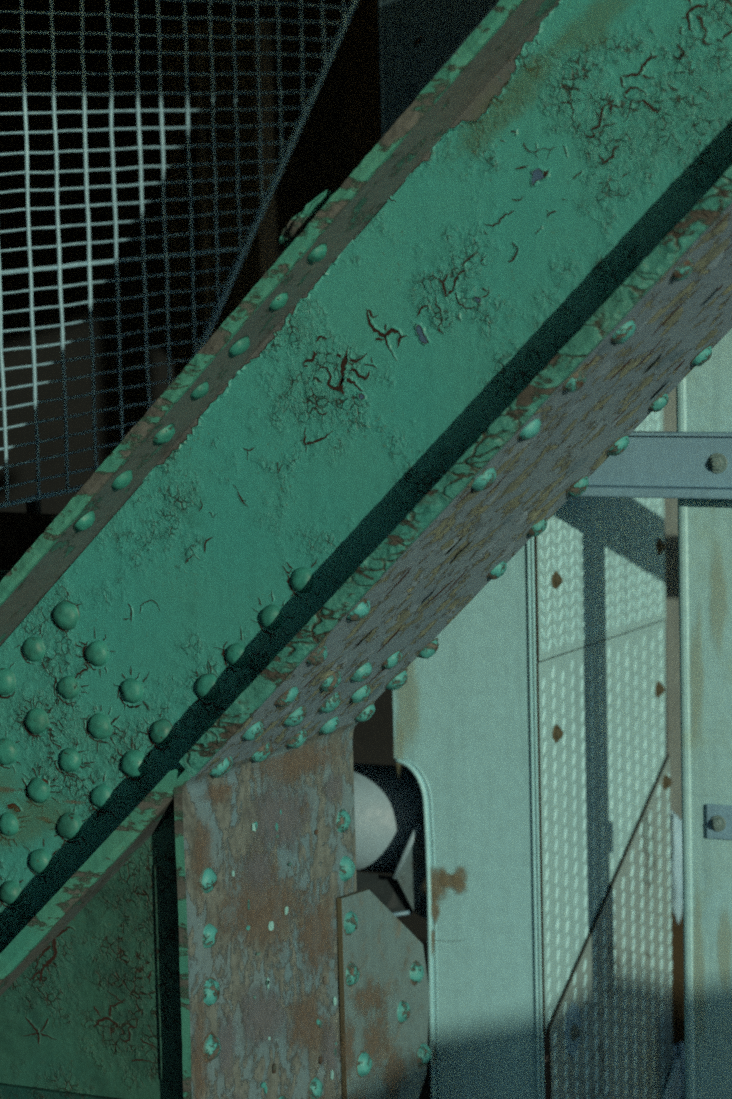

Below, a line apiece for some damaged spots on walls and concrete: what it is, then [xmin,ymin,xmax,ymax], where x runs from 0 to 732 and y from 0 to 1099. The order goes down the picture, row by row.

peeling [408,0,563,176]
peeling [529,165,551,188]
crack [300,0,732,453]
peeling [142,240,354,482]
peeling [414,322,432,346]
peeling [582,301,685,400]
crack [243,446,283,474]
crack [185,484,249,564]
peeling [302,455,593,702]
corrosion [426,868,467,952]